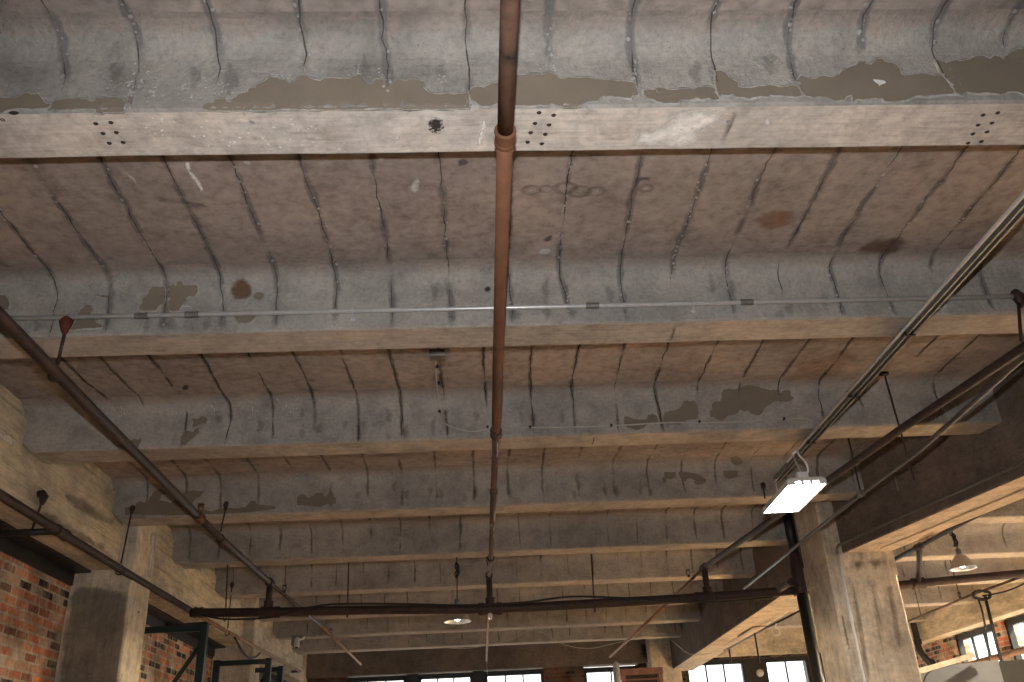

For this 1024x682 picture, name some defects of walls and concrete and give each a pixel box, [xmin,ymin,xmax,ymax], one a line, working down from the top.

peeling [0,91,136,116]
peeling [203,74,498,113]
peeling [515,46,1024,109]
crack [670,0,734,277]
crack [161,155,224,320]
peeling [137,279,200,313]
crack [556,150,581,409]
peeling [624,385,793,430]
peeling [180,416,208,445]
peeling [662,471,706,484]
peeling [125,489,275,516]